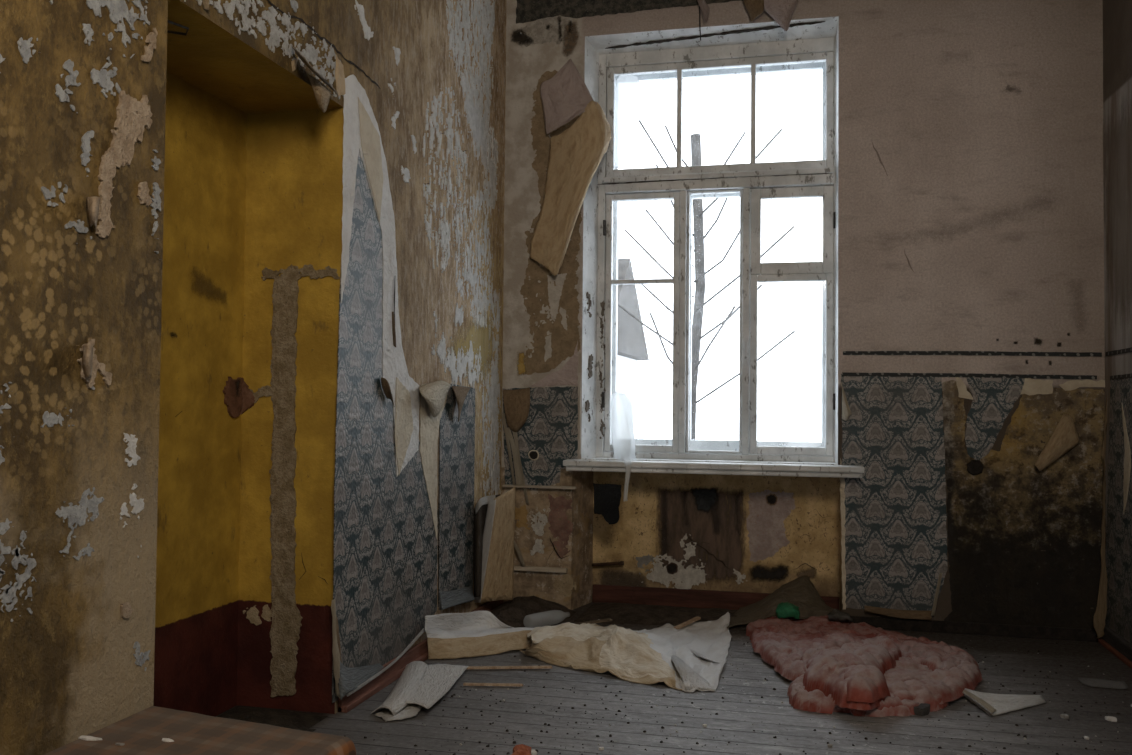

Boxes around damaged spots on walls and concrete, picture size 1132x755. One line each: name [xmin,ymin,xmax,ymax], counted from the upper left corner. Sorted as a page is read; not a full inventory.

peeling [184,0,344,99]
spalling [55,0,162,260]
peeling [41,182,68,207]
peeling [401,0,501,496]
peeling [520,59,612,439]
peeling [40,408,75,428]
peeling [123,433,140,467]
peeling [0,518,37,622]
peeling [55,487,104,561]
peeling [120,483,144,528]
spalling [636,534,707,589]
damp [942,380,1106,629]